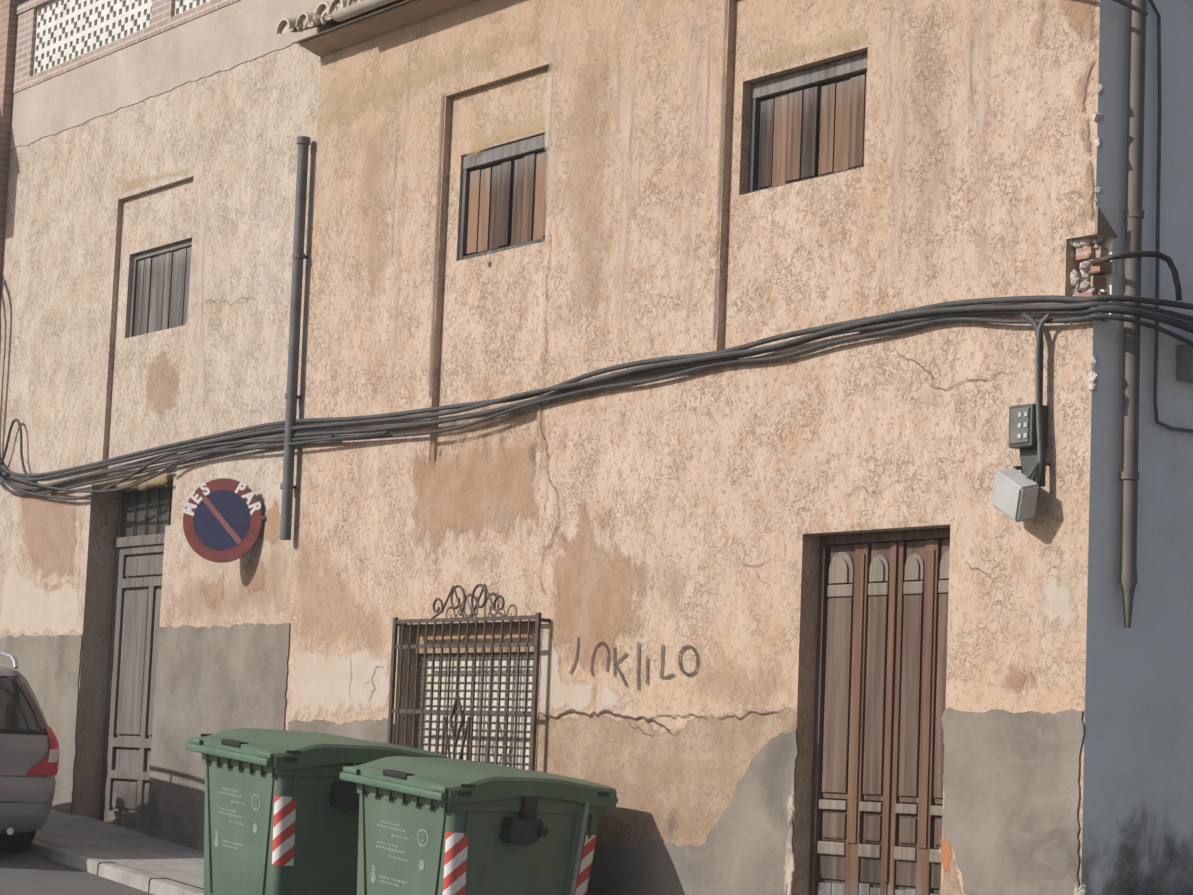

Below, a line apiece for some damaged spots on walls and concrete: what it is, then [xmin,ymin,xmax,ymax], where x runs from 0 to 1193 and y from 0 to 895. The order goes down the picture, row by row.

crack [529,233,566,593]
crack [896,351,1020,393]
spalling [1088,356,1099,392]
peeling [413,431,538,551]
peeling [0,492,83,636]
peeling [290,645,390,721]
crack [538,677,792,736]
spalling [535,506,797,856]
spalling [785,792,794,895]
spalling [938,847,960,895]